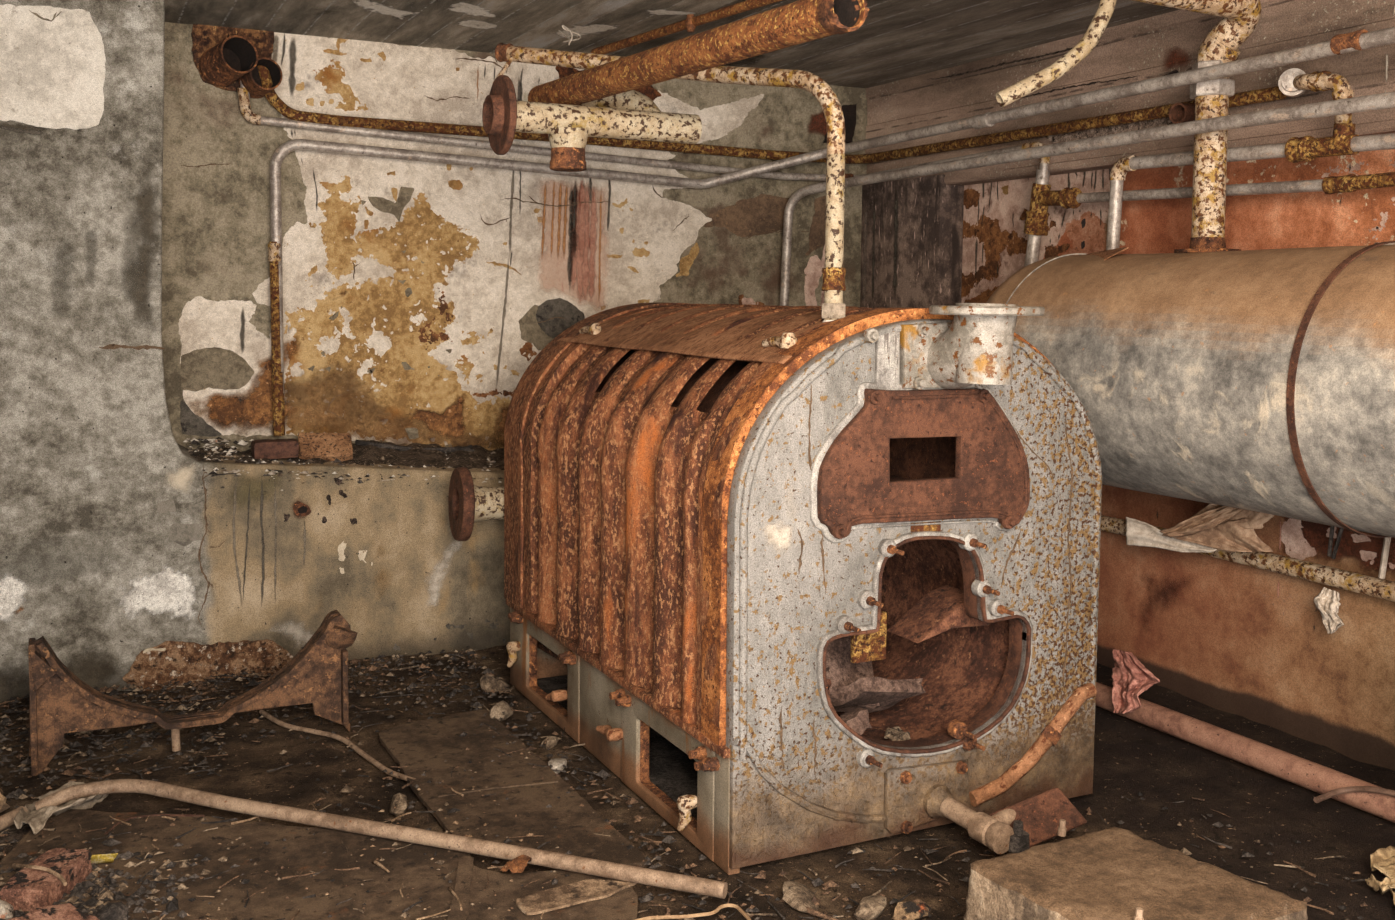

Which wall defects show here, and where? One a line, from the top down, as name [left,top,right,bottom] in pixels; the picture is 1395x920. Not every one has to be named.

peeling [178,32,789,451]
corrosion [540,178,611,307]
peeling [961,168,1112,303]
peeling [1368,197,1395,240]
peeling [1281,518,1317,560]
peeling [1326,527,1395,569]